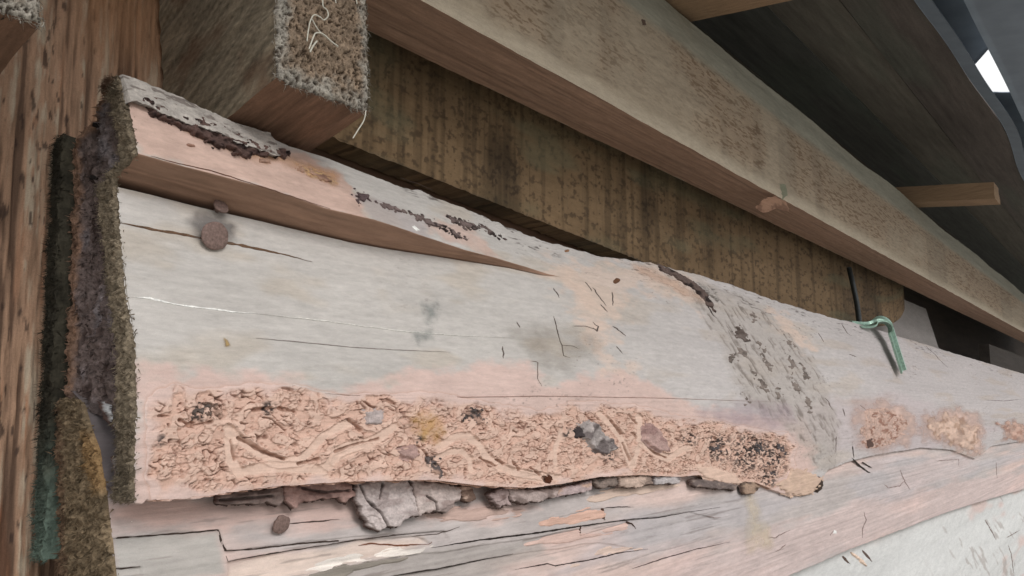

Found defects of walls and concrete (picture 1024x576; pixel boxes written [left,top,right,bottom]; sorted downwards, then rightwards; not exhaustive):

crack [123,223,201,239]
crack [227,241,312,262]
peeling [691,464,742,485]
crack [116,506,728,576]